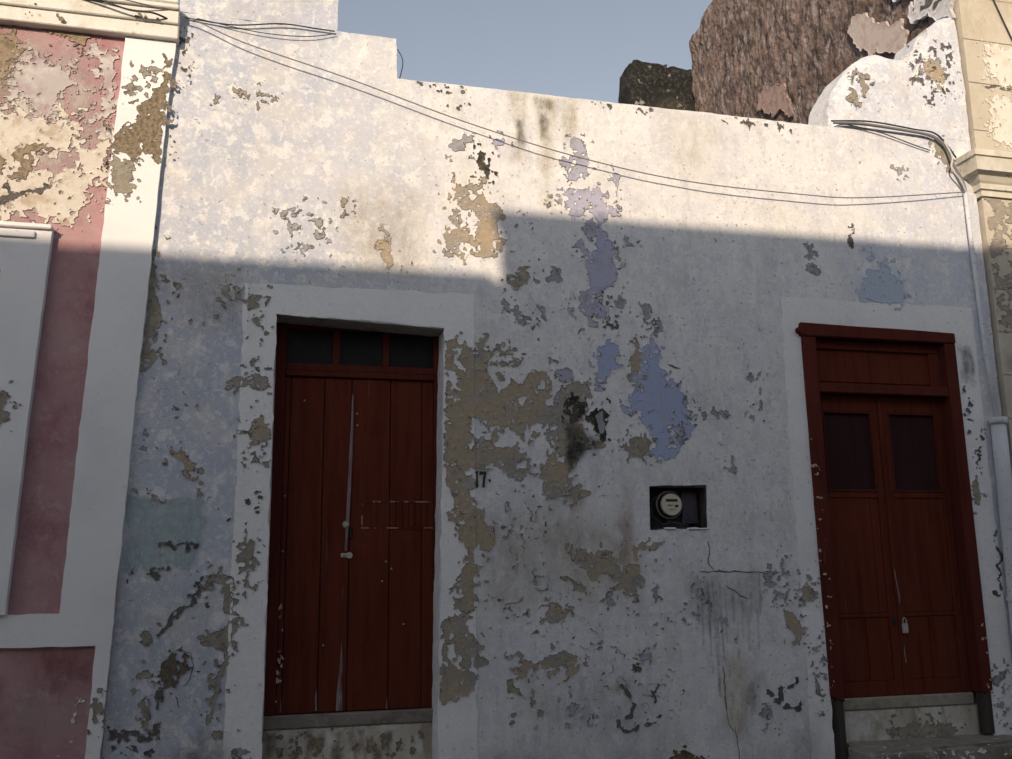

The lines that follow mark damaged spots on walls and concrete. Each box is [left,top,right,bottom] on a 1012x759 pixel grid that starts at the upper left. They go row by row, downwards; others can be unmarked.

peeling [0,10,194,235]
peeling [976,39,1012,148]
peeling [983,197,1012,333]
damp [567,428,590,467]
spalling [432,129,731,739]
peeling [961,386,990,514]
spalling [71,522,265,759]
spalling [230,726,423,759]
crack [616,682,662,734]
spalling [668,745,710,759]
crack [723,667,740,759]
crack [766,676,802,712]